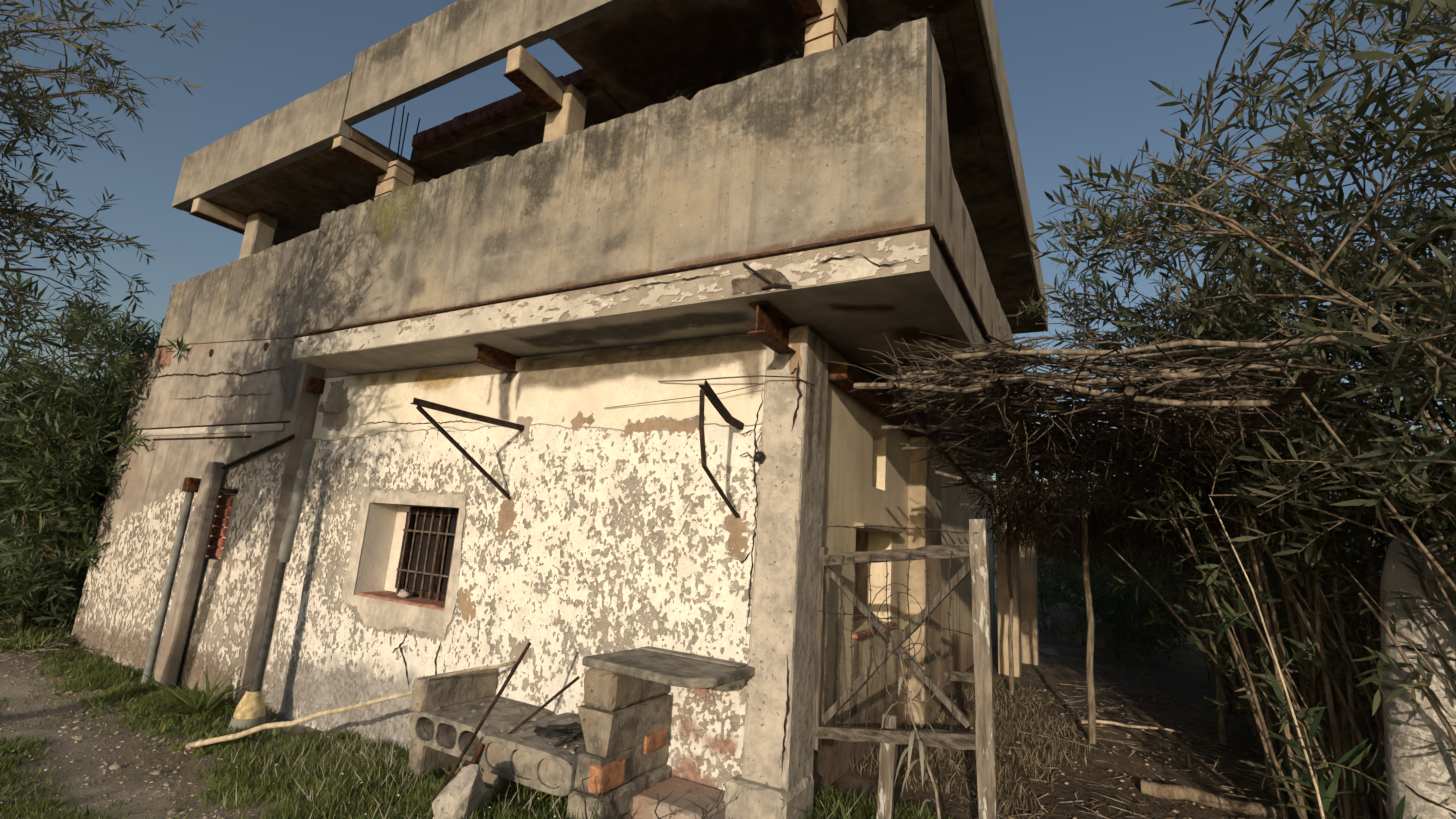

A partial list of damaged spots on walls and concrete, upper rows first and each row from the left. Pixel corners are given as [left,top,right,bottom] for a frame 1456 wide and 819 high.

damp [596,9,787,107]
crack [149,366,293,399]
peeling [291,236,928,359]
peeling [72,476,201,672]
peeling [180,452,286,696]
peeling [262,383,762,792]